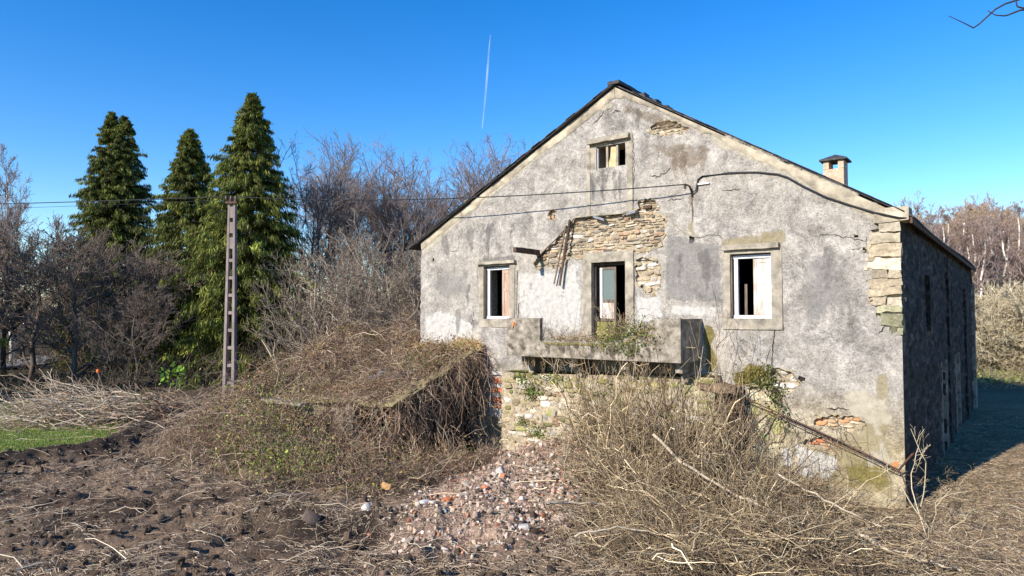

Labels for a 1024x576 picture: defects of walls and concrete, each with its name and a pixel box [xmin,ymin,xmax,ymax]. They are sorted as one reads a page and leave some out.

flaking render [647,118,689,137]
peeling [519,197,716,334]
peeling [744,368,892,478]
damp [825,375,892,493]